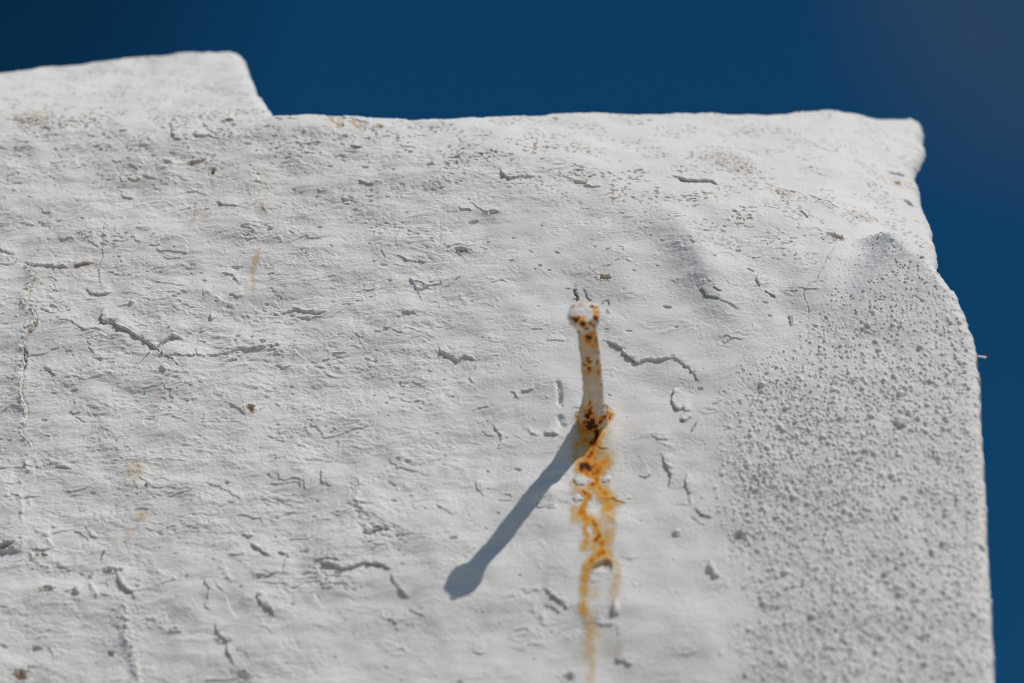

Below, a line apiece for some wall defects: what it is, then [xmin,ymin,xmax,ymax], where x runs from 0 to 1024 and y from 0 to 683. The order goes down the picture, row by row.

crack [0,253,38,448]
crack [569,283,705,384]
corrosion [571,407,623,657]